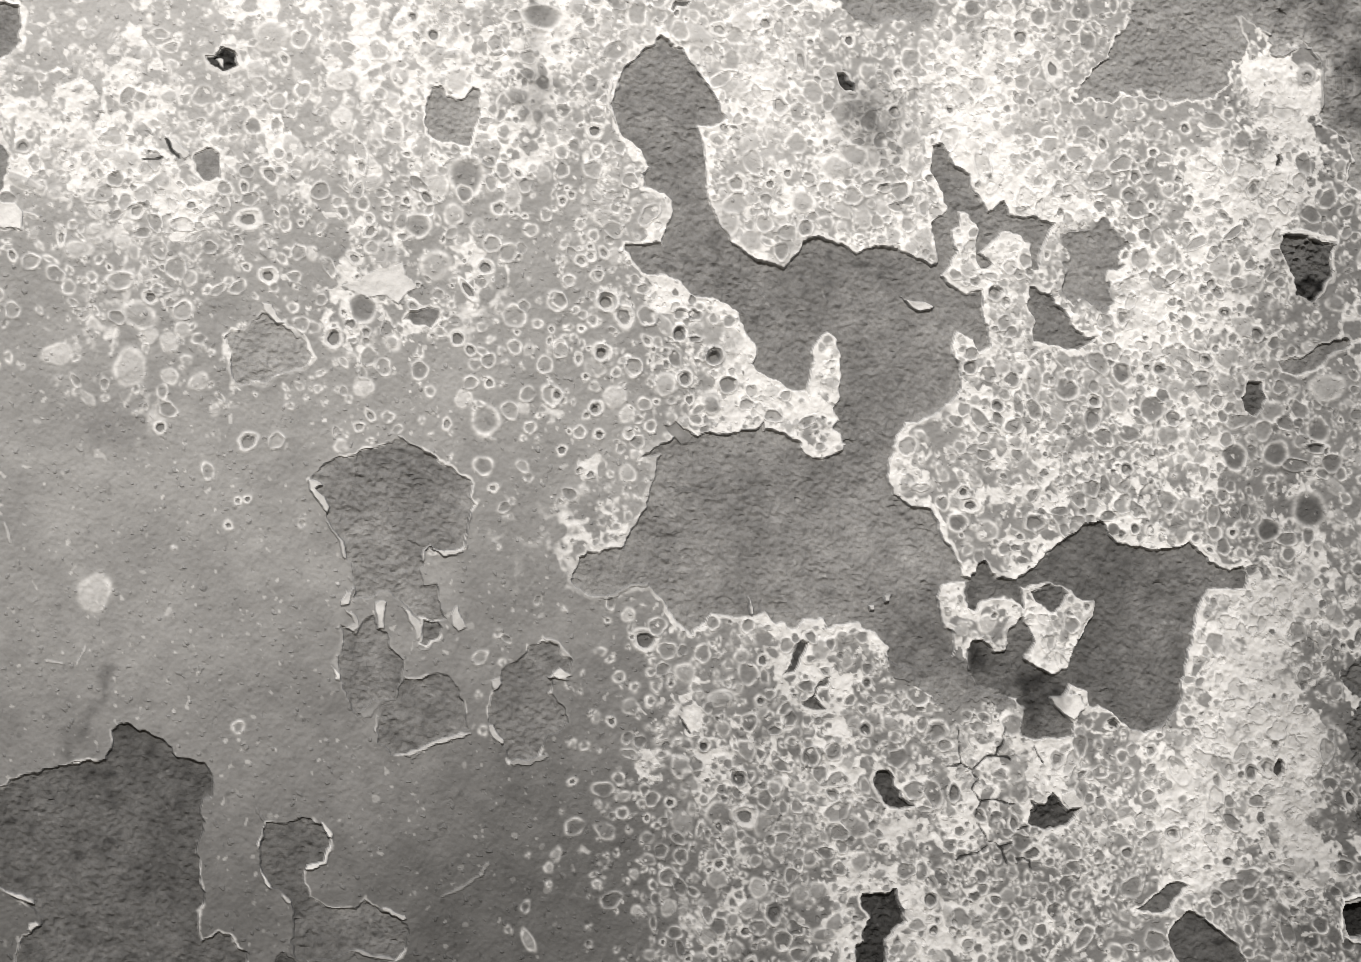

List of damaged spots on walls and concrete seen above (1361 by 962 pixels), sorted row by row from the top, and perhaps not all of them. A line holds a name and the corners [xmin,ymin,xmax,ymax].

peeling [0,3,22,59]
peeling [839,0,935,25]
peeling [425,86,482,147]
peeling [1071,0,1361,191]
spalling [1279,229,1339,304]
peeling [571,36,1249,741]
peeling [309,436,475,758]
peeling [489,639,574,767]
peeling [0,724,248,962]
peeling [257,818,410,962]
spalling [855,890,906,962]
peeling [1138,883,1246,962]